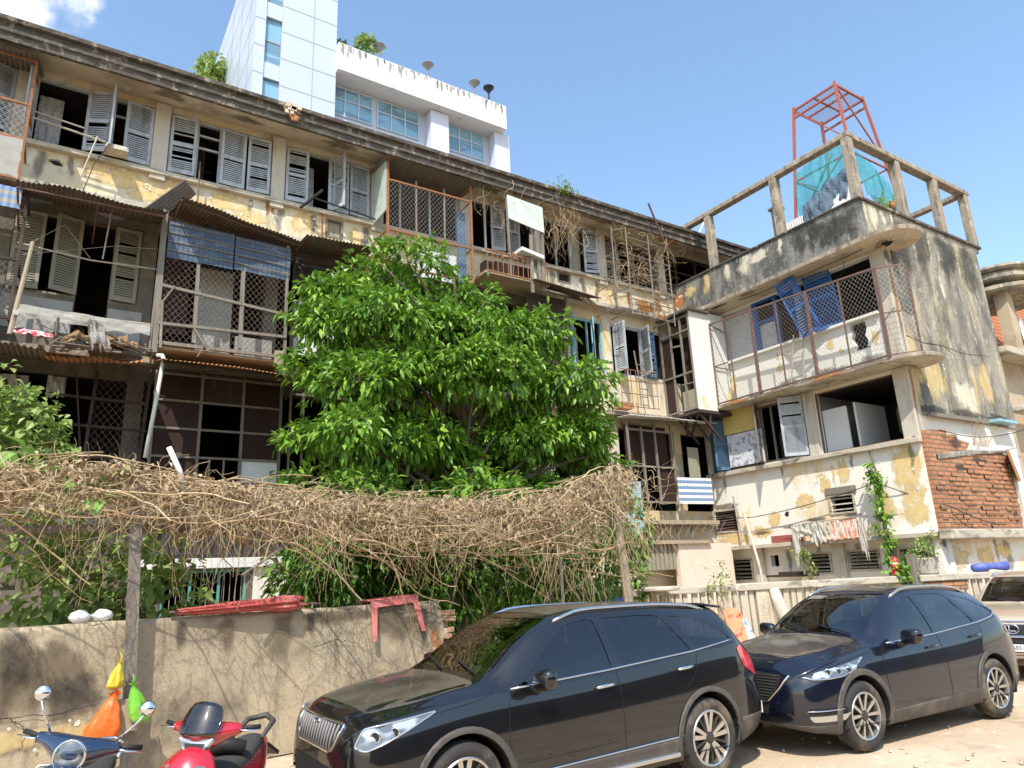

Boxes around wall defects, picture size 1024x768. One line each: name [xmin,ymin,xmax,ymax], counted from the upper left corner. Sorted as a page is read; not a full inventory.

spalling [283,101,302,121]
damp [863,202,892,228]
damp [724,217,852,279]
damp [891,233,974,299]
rust [627,292,662,315]
peeling [913,364,994,414]
damp [921,406,1005,419]
peeling [716,460,850,544]
peeling [874,446,929,526]